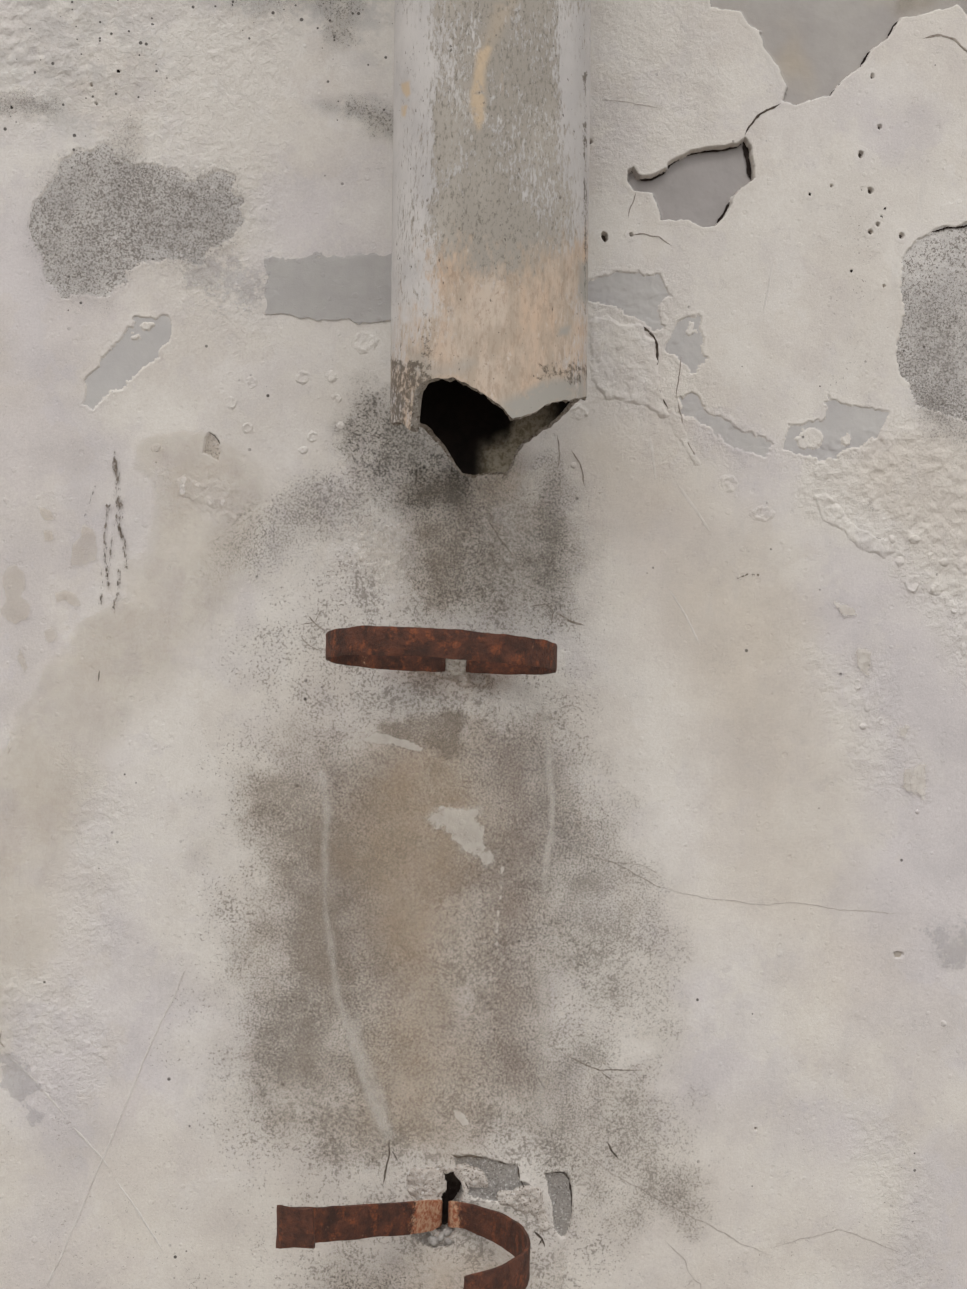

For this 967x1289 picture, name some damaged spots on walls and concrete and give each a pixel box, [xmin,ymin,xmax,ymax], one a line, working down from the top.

spalling [704,0,967,110]
spalling [22,136,252,310]
spalling [621,131,760,233]
spalling [853,145,869,164]
spalling [861,182,878,199]
peeling [78,309,177,414]
spalling [588,217,967,467]
water stain [236,390,563,606]
water stain [252,775,374,1093]
water stain [557,792,654,1000]
spalling [435,1149,579,1245]
water stain [555,1043,688,1207]